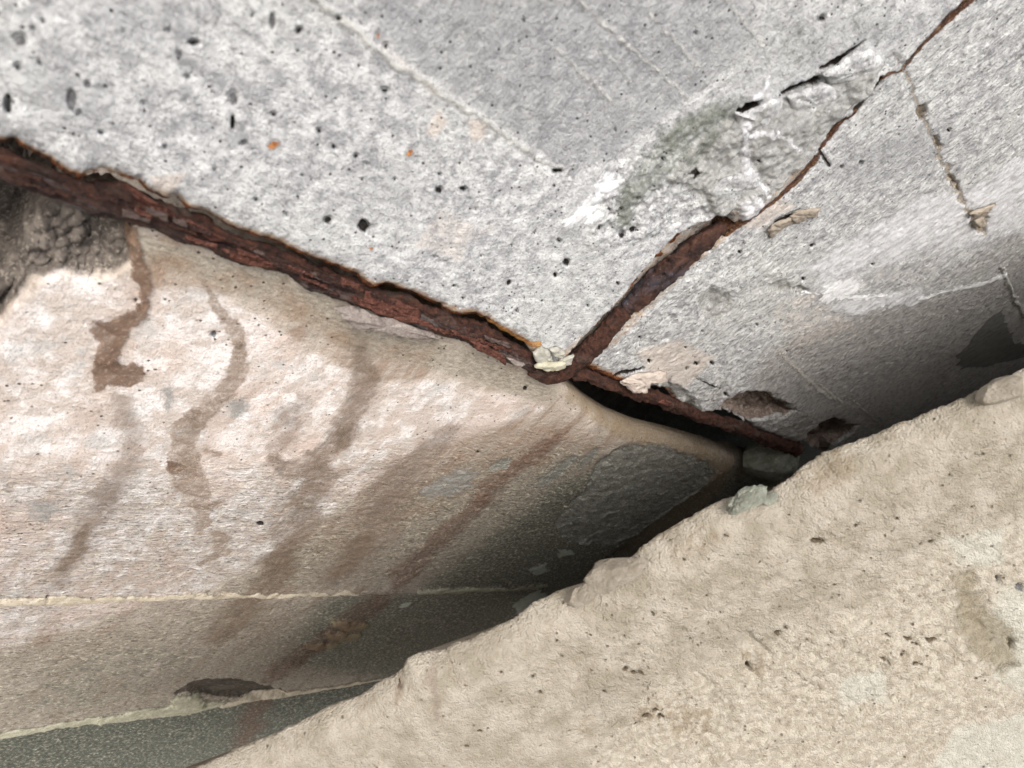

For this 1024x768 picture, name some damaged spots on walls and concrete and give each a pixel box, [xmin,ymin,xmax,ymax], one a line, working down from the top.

crack [711,0,974,237]
corrosion [0,139,542,392]
corrosion [166,280,247,566]
crack [614,367,642,376]
corrosion [572,364,805,458]
spalling [719,391,790,419]
spalling [803,417,854,451]
leakage [207,350,378,641]
peeling [174,677,287,698]